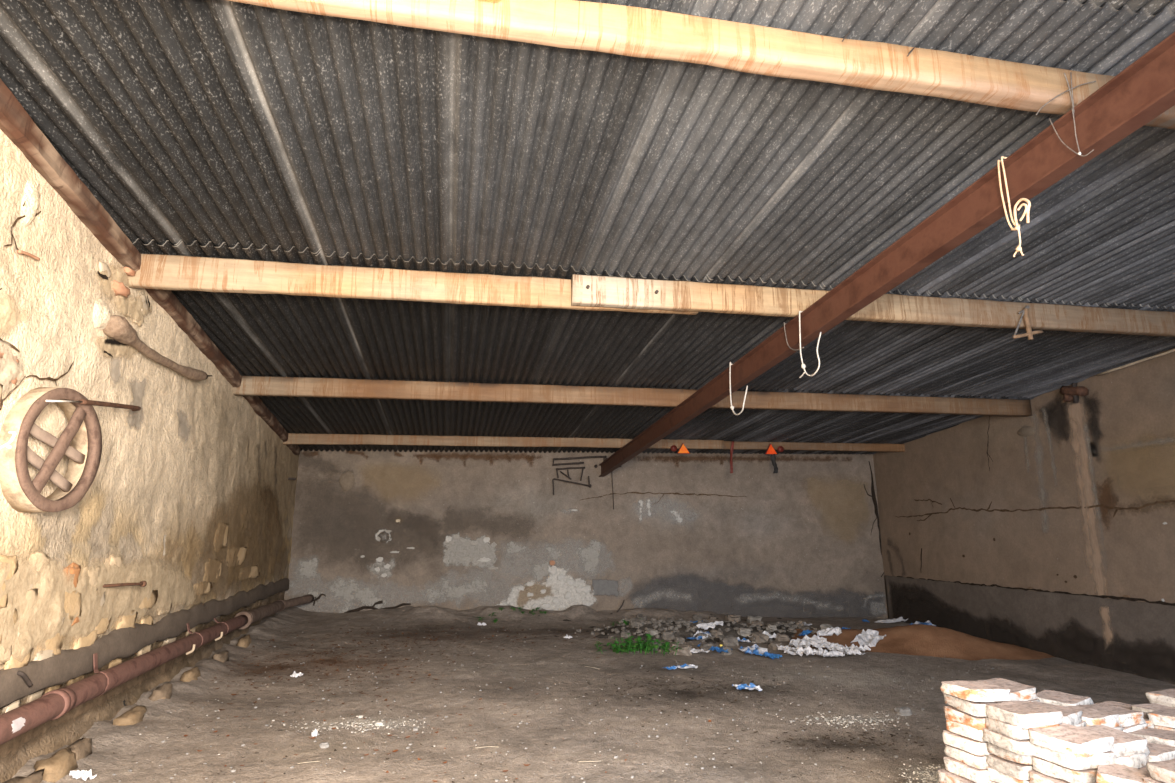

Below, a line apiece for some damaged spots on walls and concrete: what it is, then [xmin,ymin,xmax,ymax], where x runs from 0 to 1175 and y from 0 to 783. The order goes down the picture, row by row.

crack [4,201,41,255]
peeling [443,532,498,571]
leakage [631,396,1175,682]
crack [864,461,1175,606]
spalling [497,560,597,611]